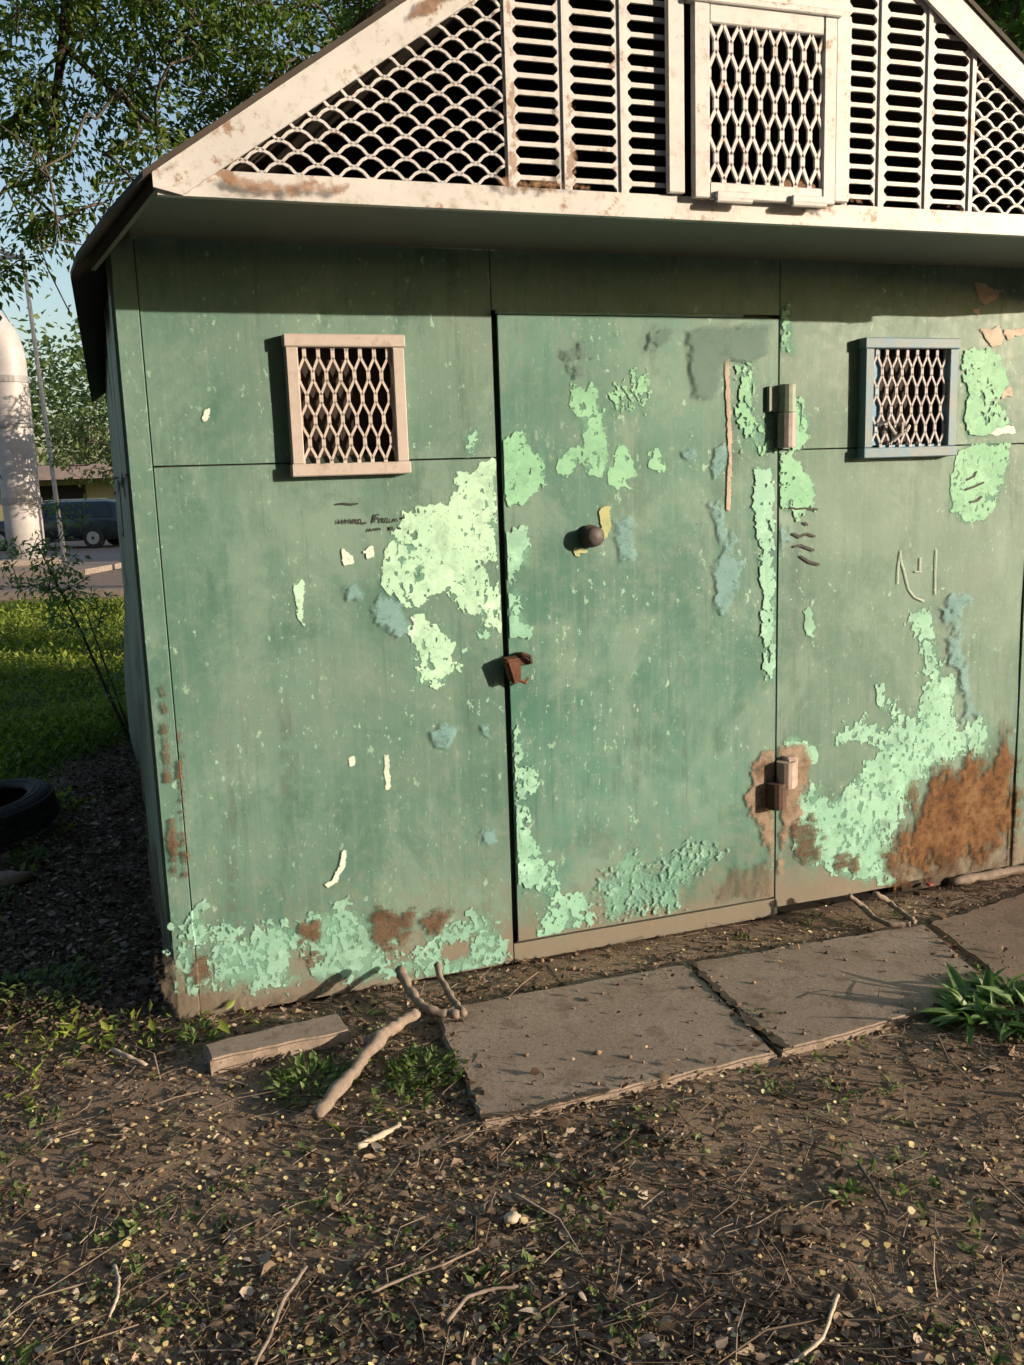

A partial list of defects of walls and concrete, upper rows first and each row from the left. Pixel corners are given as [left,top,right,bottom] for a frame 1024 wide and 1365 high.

rust [410,0,445,18]
rust [500,82,588,192]
peeling [950,281,1024,523]
peeling [341,367,666,690]
peeling [733,361,816,682]
peeling [514,725,730,937]
rust [745,744,863,875]
peeling [783,606,991,886]
rust [884,721,1024,891]
rust [298,919,321,967]
peeling [162,894,512,997]
rust [369,905,454,952]